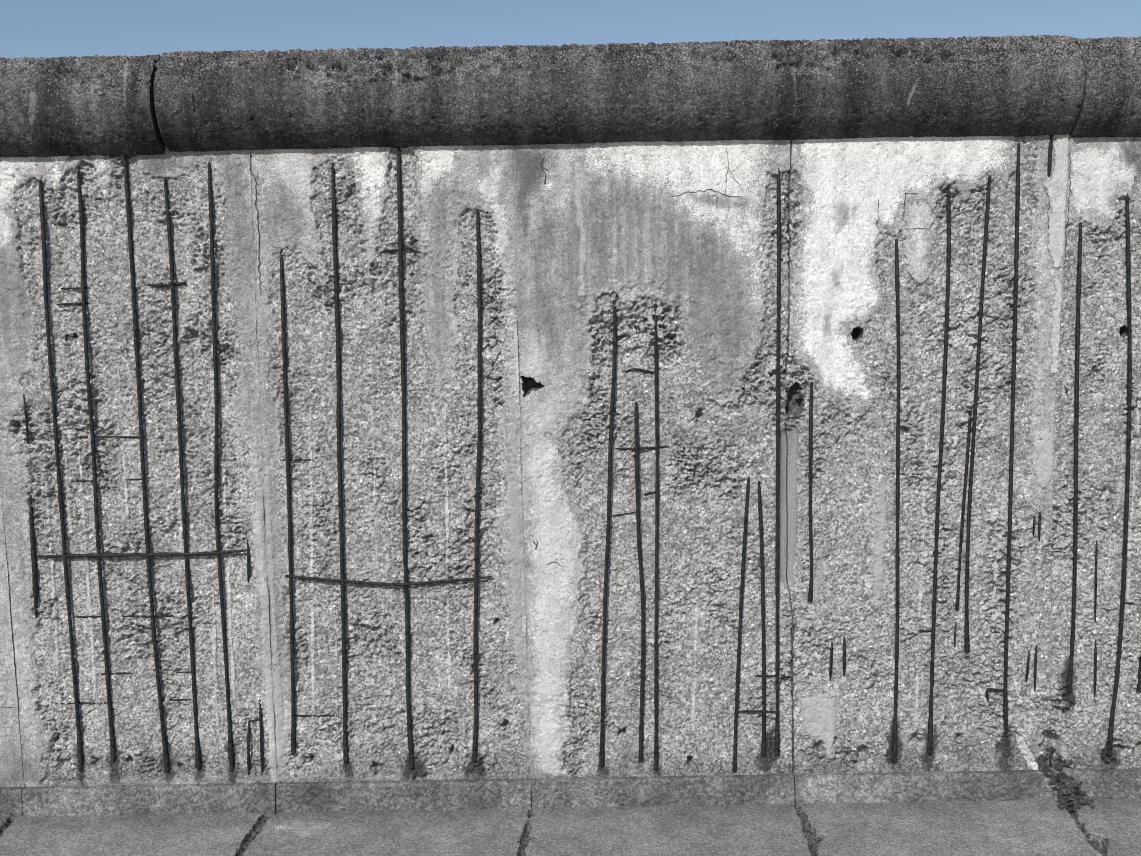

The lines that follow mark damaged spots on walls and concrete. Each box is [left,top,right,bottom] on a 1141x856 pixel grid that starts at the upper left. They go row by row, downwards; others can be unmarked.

leakage [515,147,544,213]
leakage [534,185,741,381]
spalling [0,135,1141,812]
crack [1088,833,1109,851]